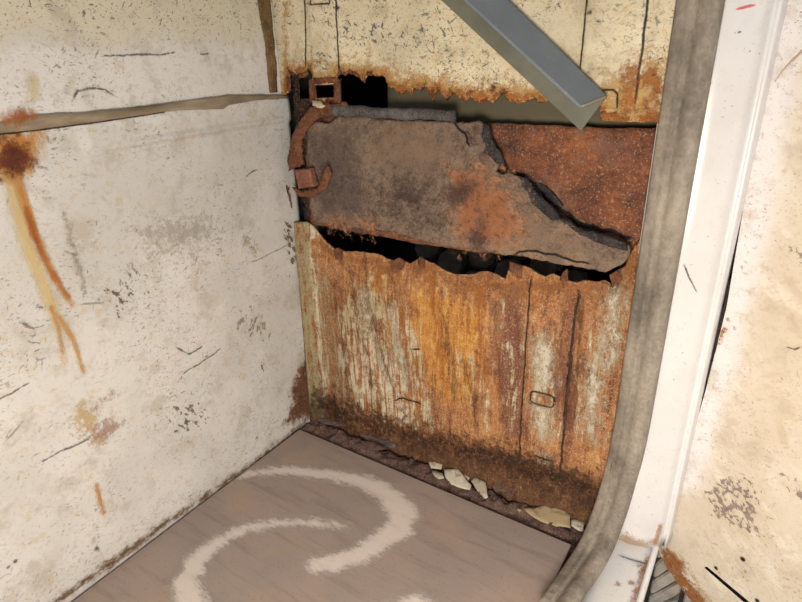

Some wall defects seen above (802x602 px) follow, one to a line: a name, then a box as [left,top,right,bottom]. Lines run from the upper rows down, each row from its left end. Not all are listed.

corrosion [281,37,547,103]
corrosion [600,51,664,122]
crack [453,122,632,251]
corrosion [0,109,84,372]
crack [515,250,589,264]
corrosion [55,240,639,602]
corrosion [616,525,712,602]